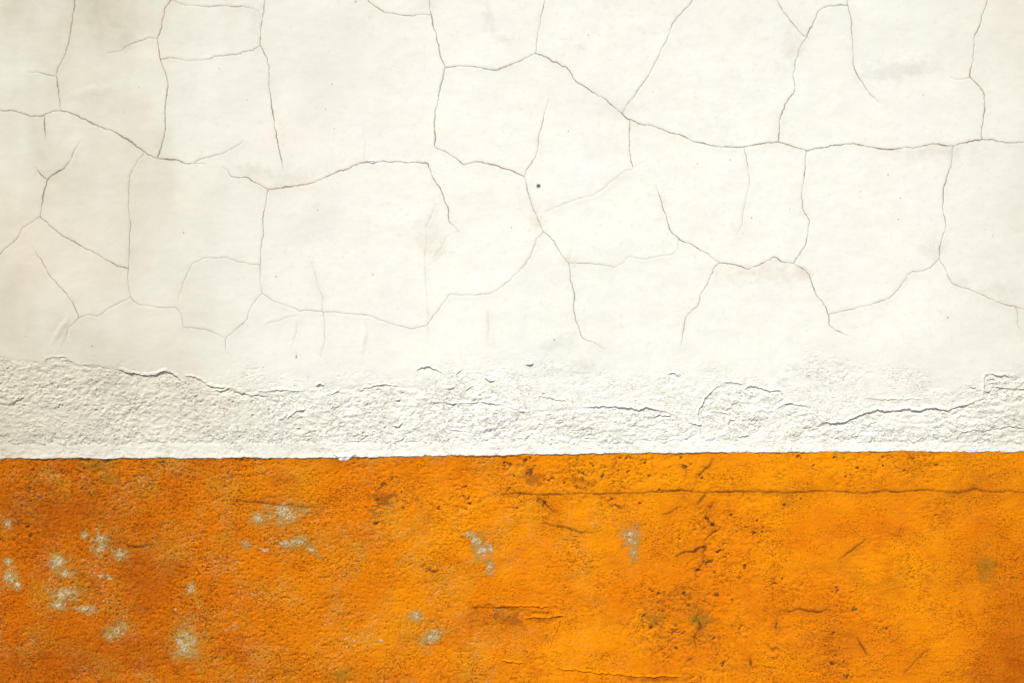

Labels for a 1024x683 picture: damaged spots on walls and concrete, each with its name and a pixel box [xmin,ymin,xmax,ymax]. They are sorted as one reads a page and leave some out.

crack [1,63,209,164]
crack [669,26,1017,298]
flaking render [0,354,1024,482]